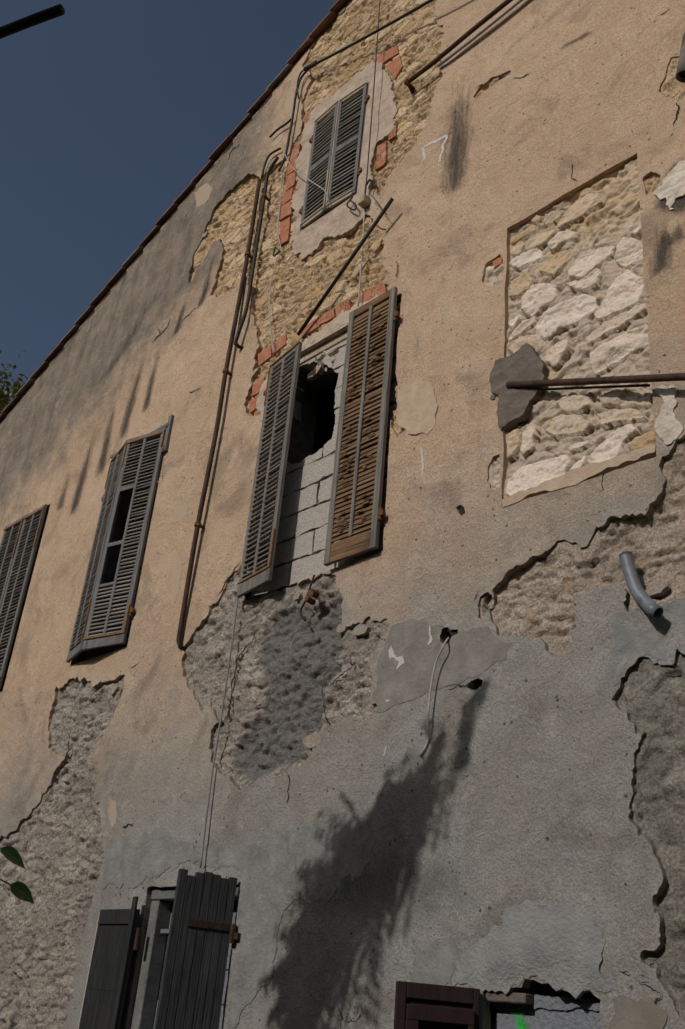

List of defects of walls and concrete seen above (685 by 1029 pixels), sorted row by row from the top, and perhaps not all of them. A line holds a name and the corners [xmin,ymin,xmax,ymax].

spalling [191,0,443,417]
spalling [644,173,661,193]
spalling [660,57,685,101]
spalling [0,676,376,1029]
spalling [184,440,685,1017]